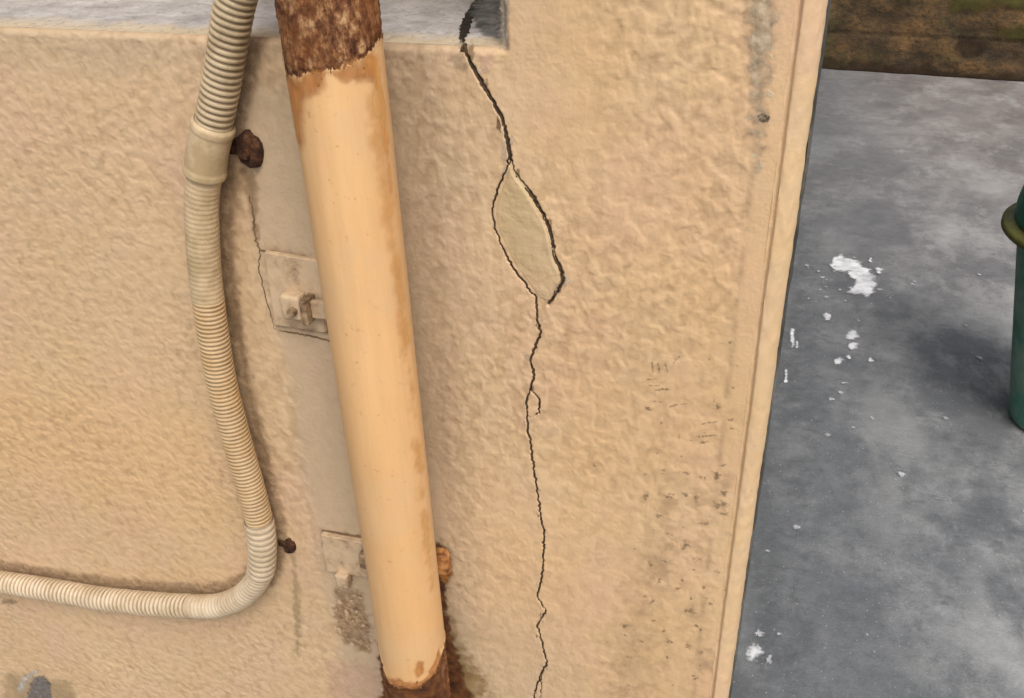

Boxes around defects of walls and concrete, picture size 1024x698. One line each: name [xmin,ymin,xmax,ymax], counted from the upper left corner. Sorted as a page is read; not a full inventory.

corrosion [274,0,388,150]
crack [459,0,571,698]
corrosion [370,571,485,698]